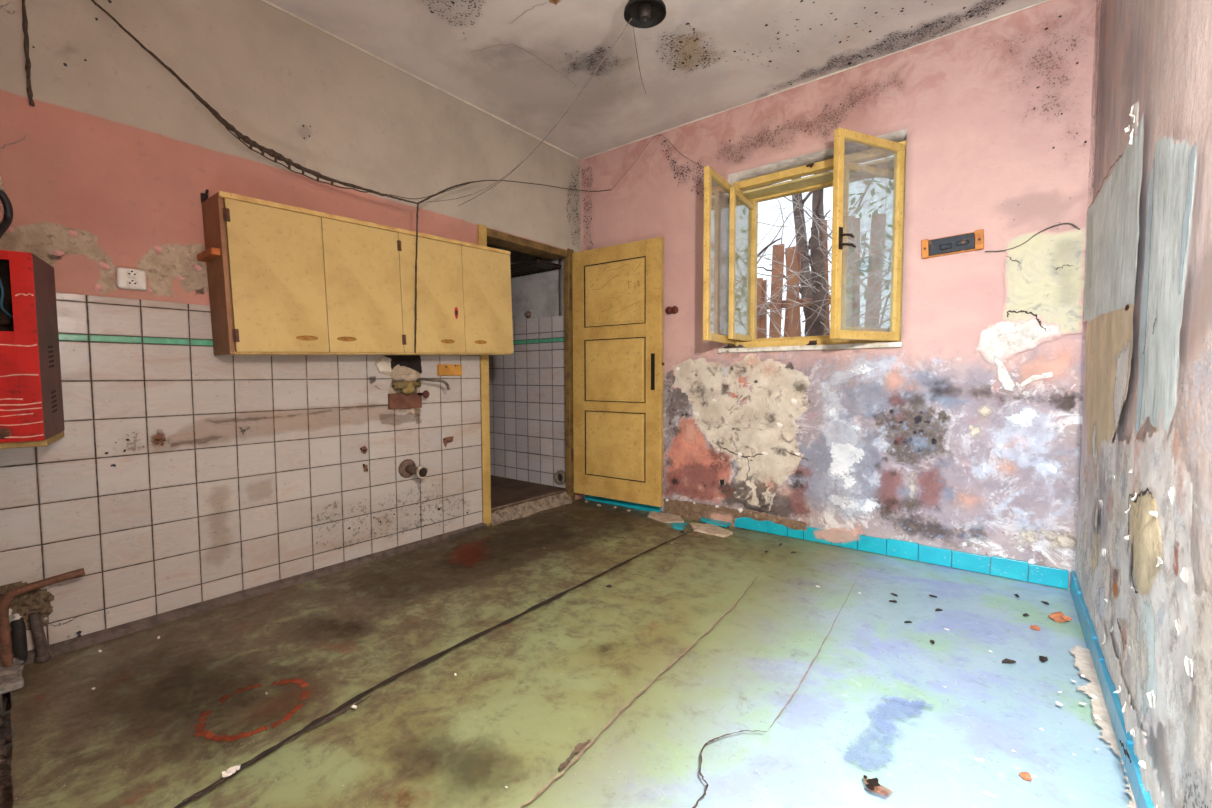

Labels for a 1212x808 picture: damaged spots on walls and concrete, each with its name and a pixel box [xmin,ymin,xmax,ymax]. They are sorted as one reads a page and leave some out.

water stain [762,0,1006,96]
flaking render [0,220,118,294]
flaking render [135,243,209,298]
peeling [369,355,422,394]
water stain [663,369,705,433]
flaking render [974,314,1063,392]
water stain [1055,396,1074,411]
flaking render [663,353,858,542]
water stain [724,469,809,517]
water stain [828,374,1042,537]
flaking render [1069,408,1212,808]
crack [692,581,856,808]